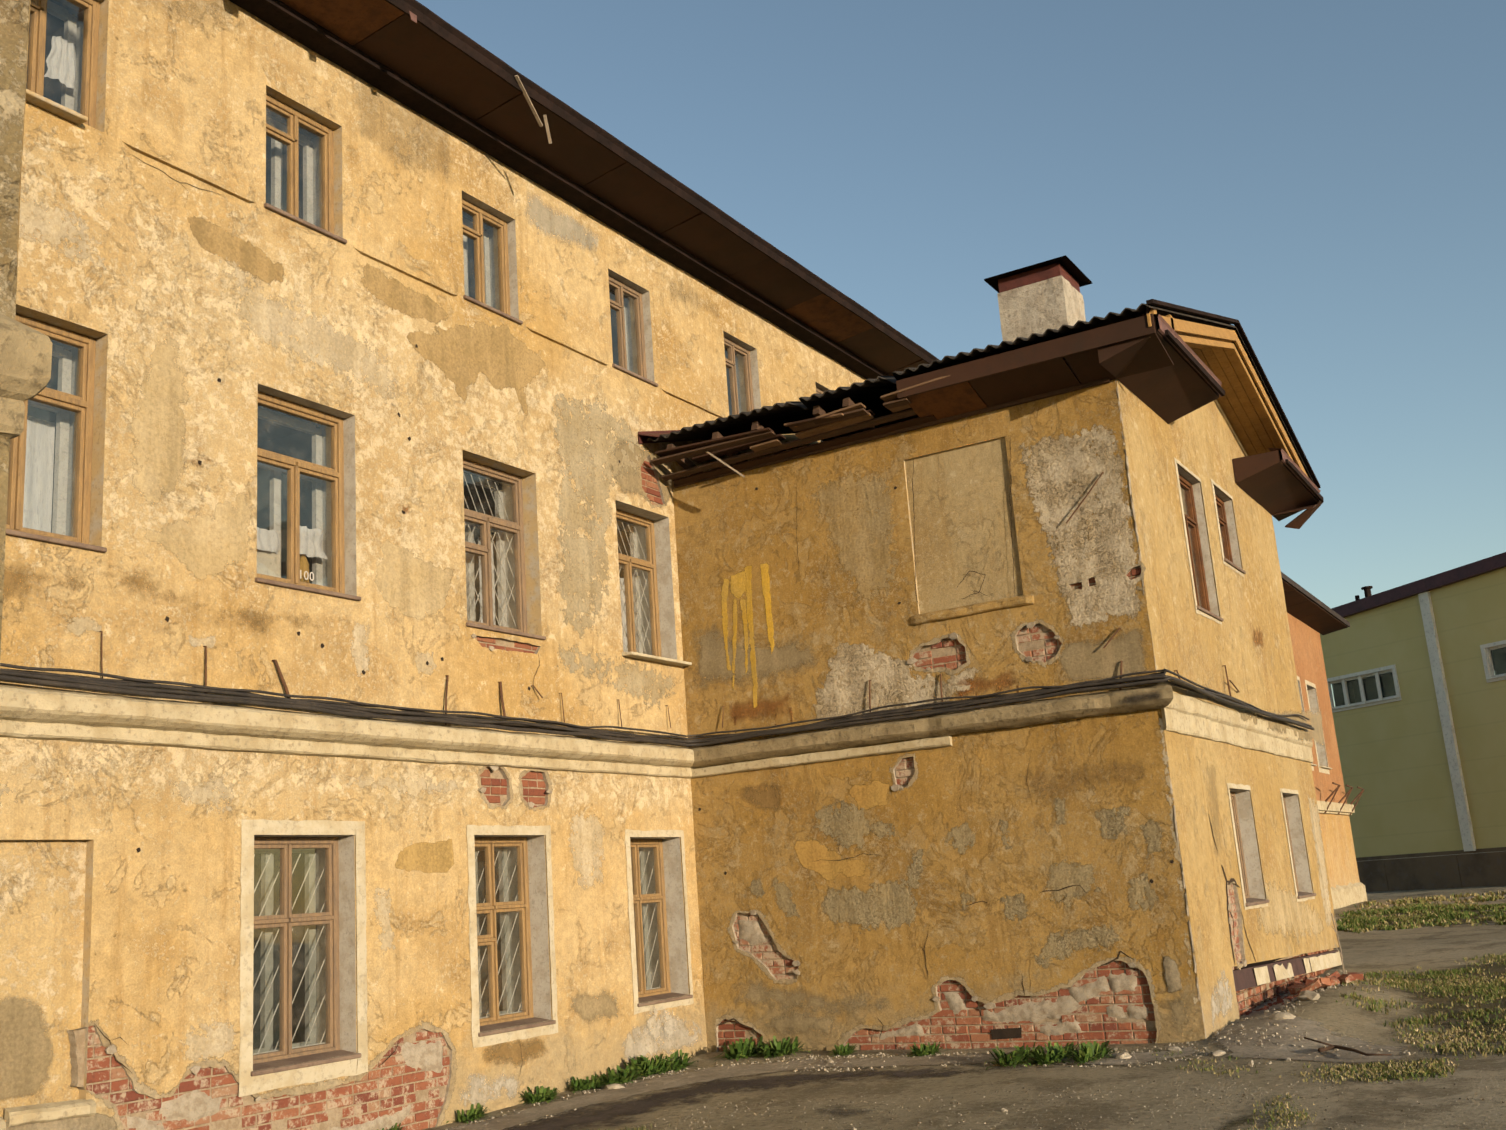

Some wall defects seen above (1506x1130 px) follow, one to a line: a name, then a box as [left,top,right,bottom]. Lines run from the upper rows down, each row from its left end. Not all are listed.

peeling [1010,424,1146,667]
peeling [813,632,979,723]
spalling [477,766,553,811]
spalling [727,878,801,985]
peeling [794,752,925,934]
peeling [998,893,1030,922]
peeling [1045,859,1101,907]
spalling [73,1018,458,1130]
spalling [714,1015,765,1052]
spalling [838,925,1162,1050]